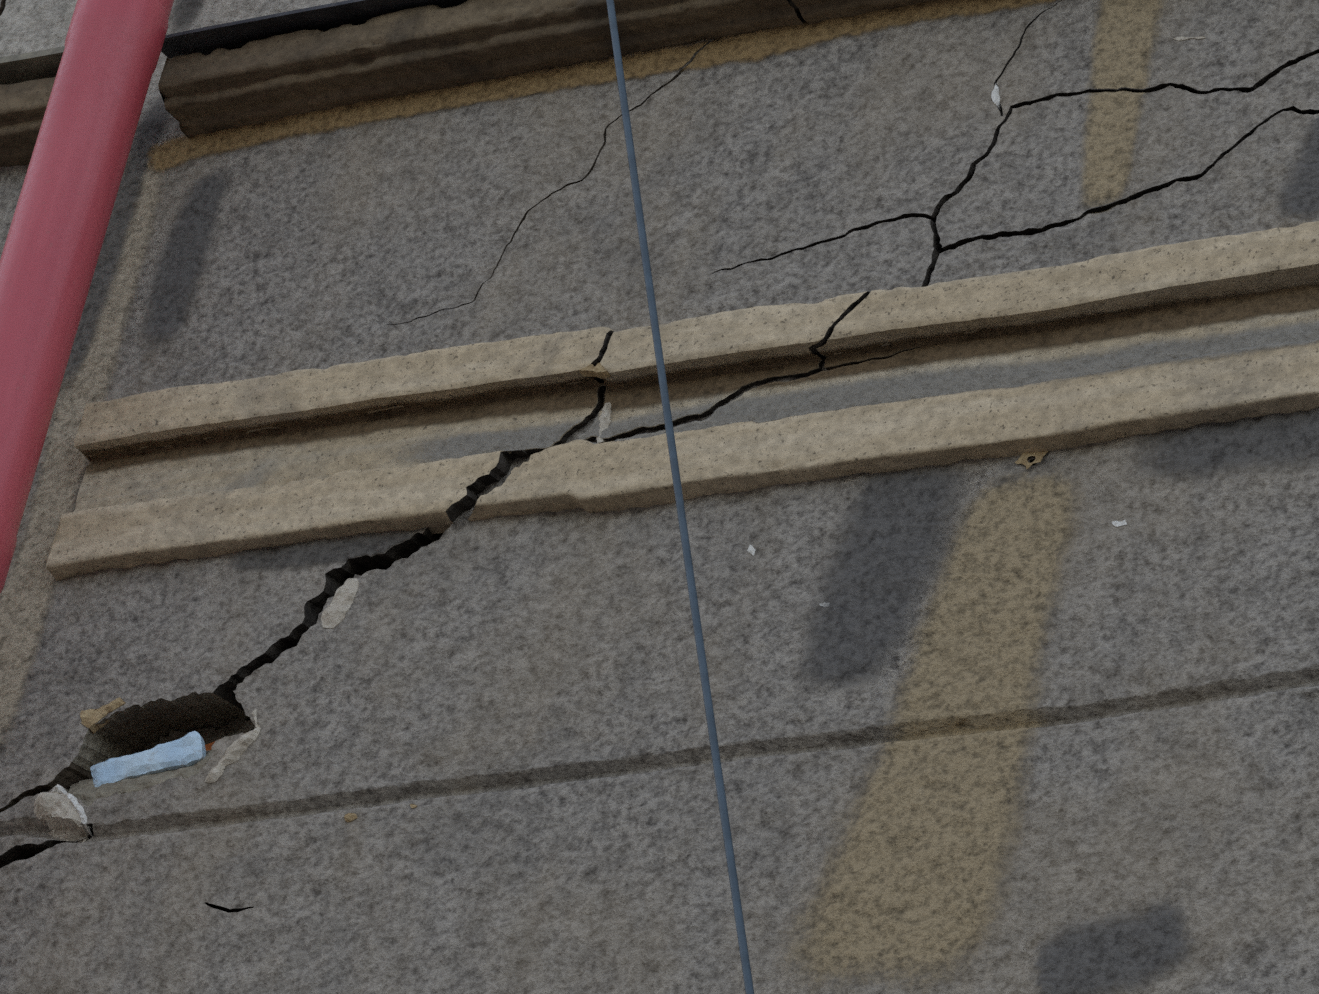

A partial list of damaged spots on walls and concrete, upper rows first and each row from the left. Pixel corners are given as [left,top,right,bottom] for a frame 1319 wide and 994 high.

crack [0,0,8,16]
crack [387,40,714,325]
crack [712,0,1319,287]
crack [213,291,919,710]
damp [0,157,1319,739]
crack [0,762,94,868]
hole [64,692,261,806]
crack [204,902,254,913]
damp [804,477,1071,975]